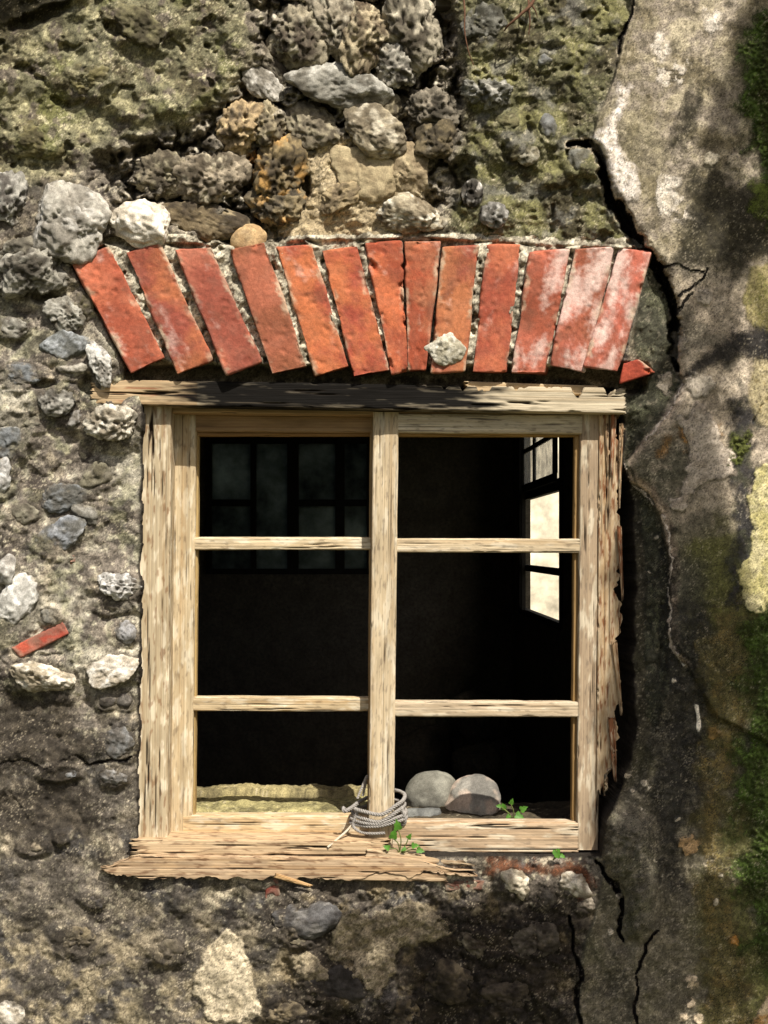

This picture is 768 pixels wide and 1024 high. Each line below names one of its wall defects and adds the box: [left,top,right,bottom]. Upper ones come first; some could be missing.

crack [566,139,708,372]
flaking render [624,266,738,728]
crack [568,915,584,1024]
crack [594,859,659,1024]